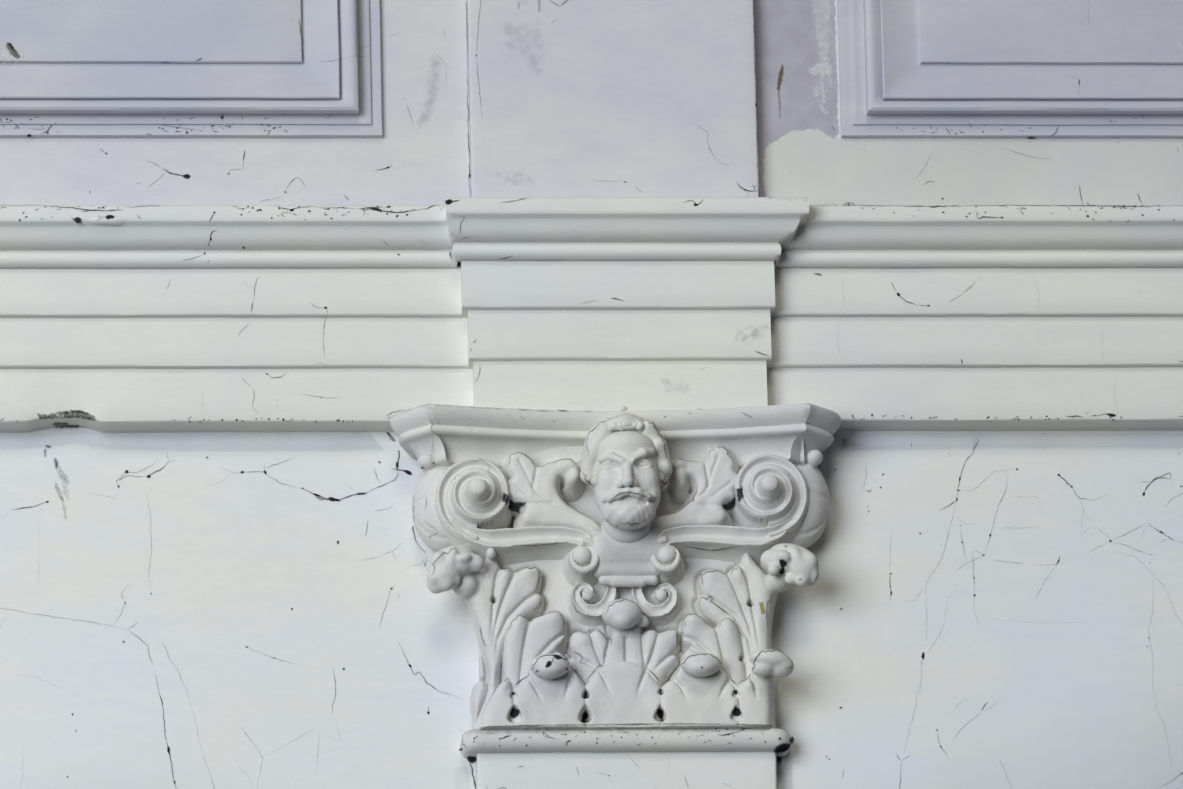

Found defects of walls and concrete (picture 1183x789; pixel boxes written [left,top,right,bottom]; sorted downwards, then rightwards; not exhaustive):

peeling [754,0,838,198]
crack [241,433,412,501]
crack [157,684,175,784]
crack [779,736,794,750]